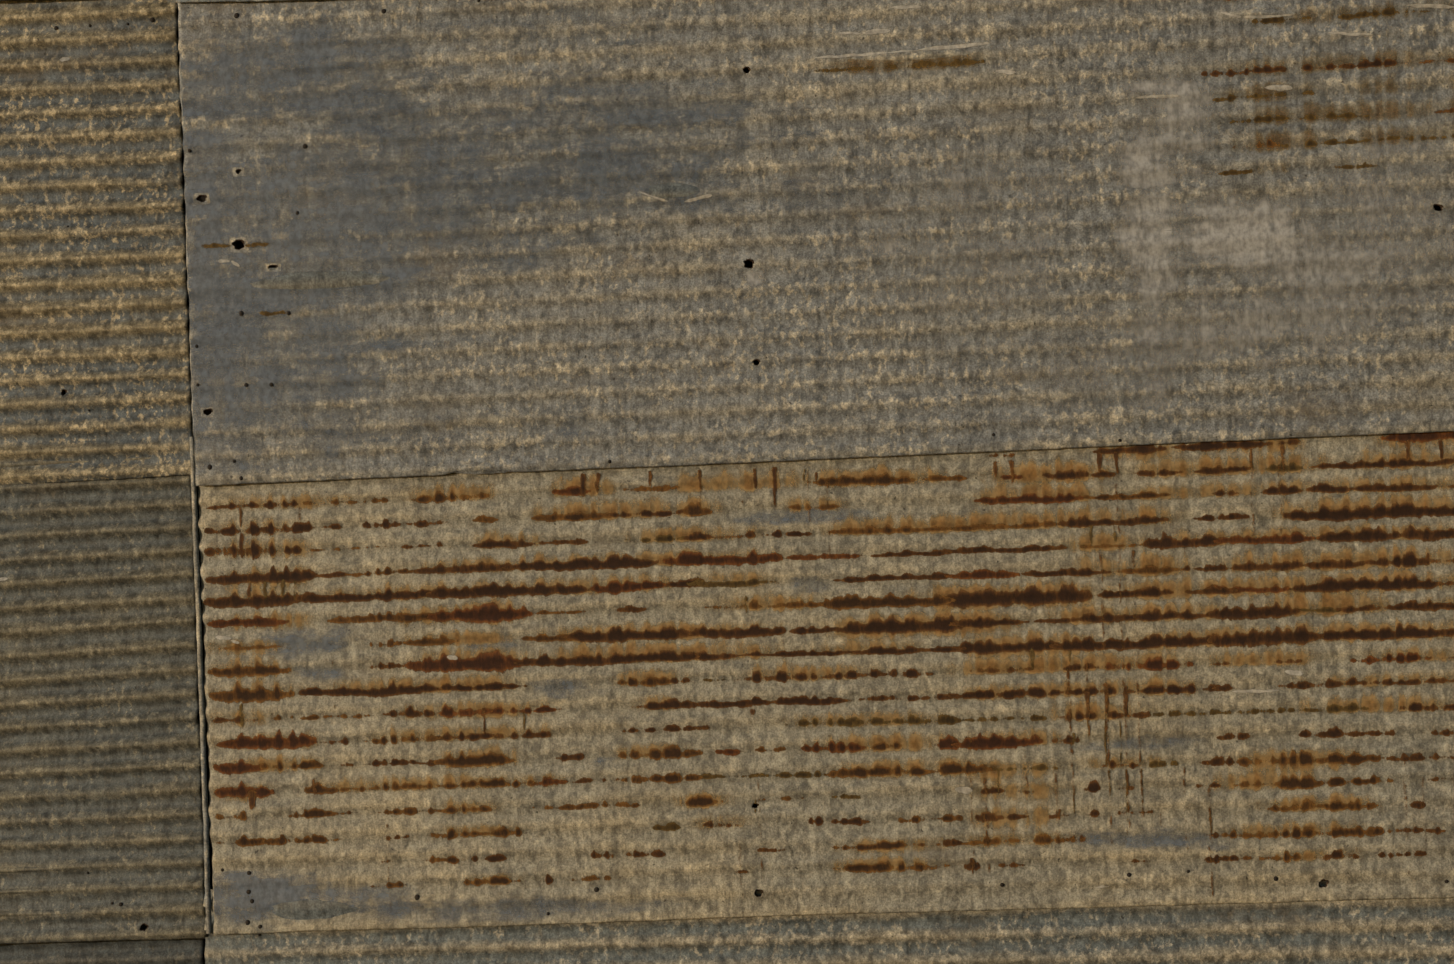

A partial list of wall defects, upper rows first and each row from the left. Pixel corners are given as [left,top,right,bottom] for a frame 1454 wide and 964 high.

rust [370,860,406,906]
rust [203,431,1454,896]